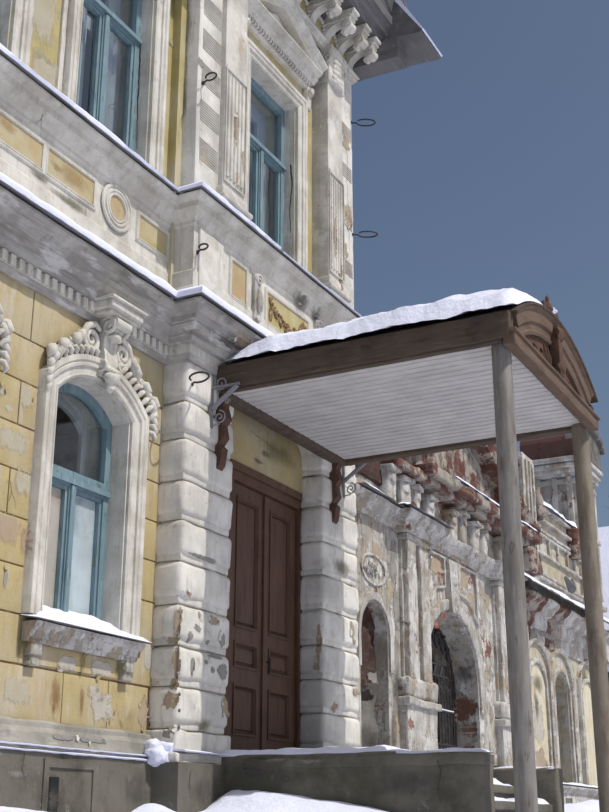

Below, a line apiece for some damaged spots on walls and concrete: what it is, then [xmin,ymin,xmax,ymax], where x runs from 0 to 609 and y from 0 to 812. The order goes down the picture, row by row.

crack [287,165,295,233]
peeling [0,513,35,551]
peeling [162,607,228,713]
peeling [313,624,323,670]
peeling [88,660,116,723]
spalling [162,725,180,738]
peeling [458,720,478,746]